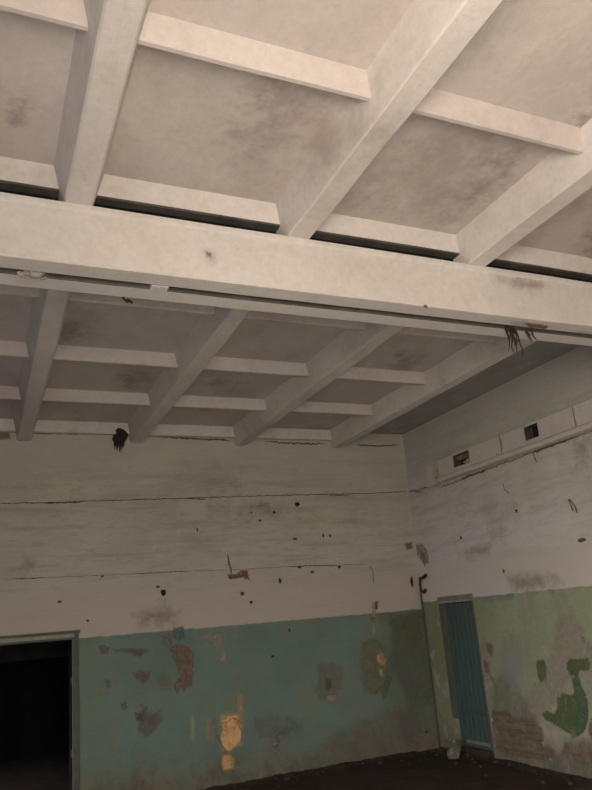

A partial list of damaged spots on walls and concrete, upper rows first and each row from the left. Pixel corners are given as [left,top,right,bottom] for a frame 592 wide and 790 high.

crack [0,407,592,504]
crack [9,564,374,583]
peeling [163,627,195,692]
spalling [491,659,592,773]